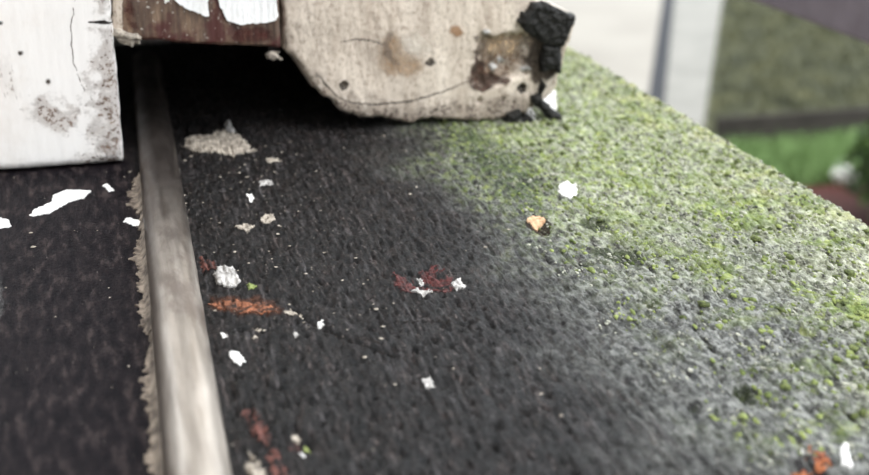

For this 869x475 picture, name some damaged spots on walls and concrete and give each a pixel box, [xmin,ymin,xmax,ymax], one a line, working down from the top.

peeling [164,0,209,17]
peeling [219,0,279,25]
crack [70,8,113,99]
leakage [524,37,556,83]
peeling [29,190,91,217]
rust [208,297,279,317]